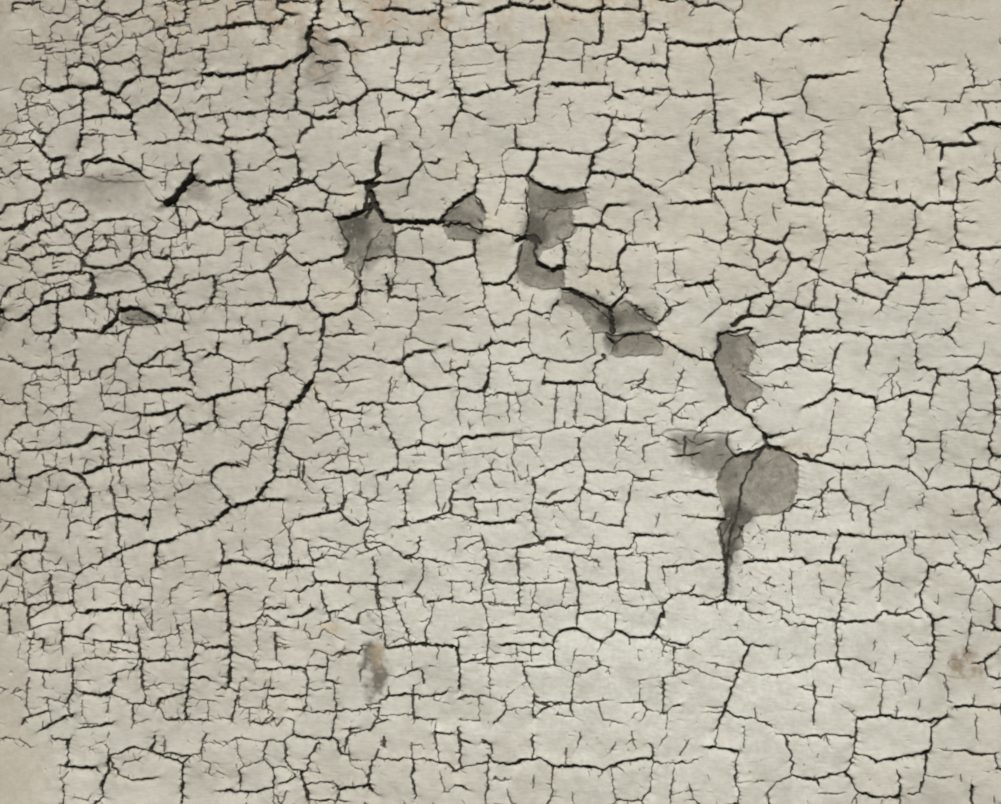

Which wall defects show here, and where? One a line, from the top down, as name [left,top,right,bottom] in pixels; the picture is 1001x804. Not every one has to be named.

crack [799,37,828,47]
crack [971,148,1001,186]
peeling [334,207,398,284]
peeling [439,190,489,248]
peeling [512,175,668,361]
crack [624,361,700,426]
peeling [712,329,767,415]
crack [650,490,721,511]
peeling [651,425,803,603]
crack [971,646,1001,689]
crack [798,680,834,726]
crack [940,747,1001,773]